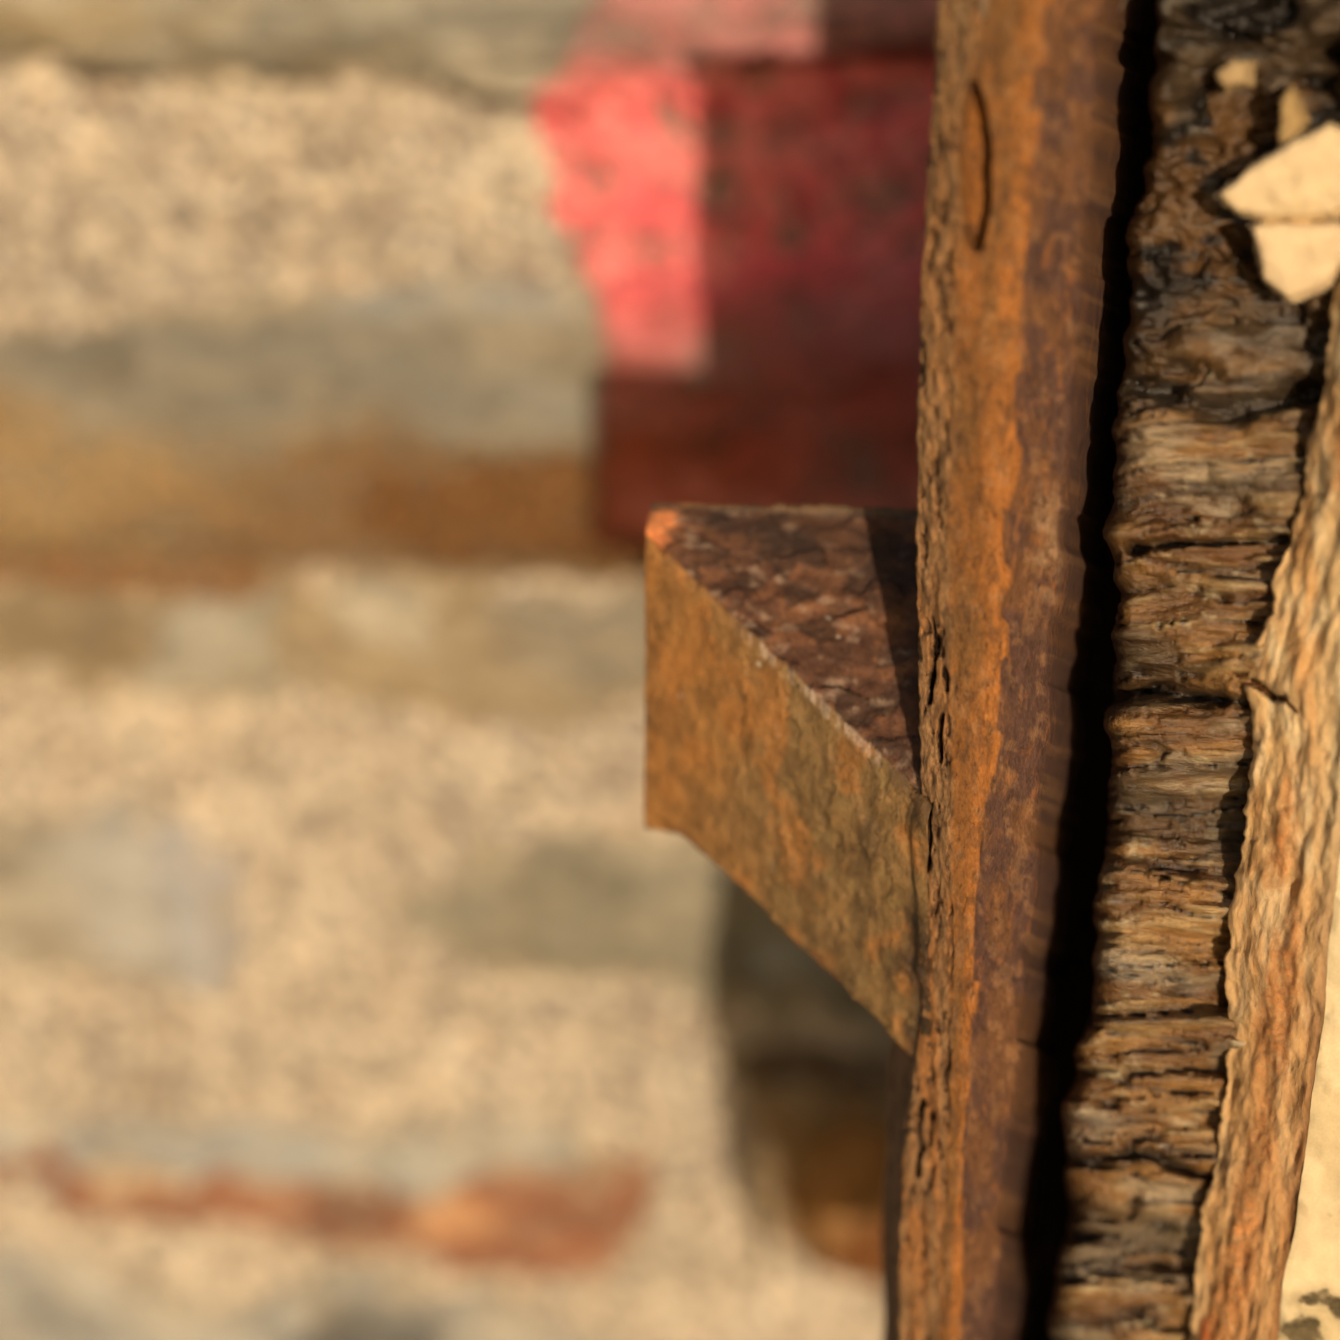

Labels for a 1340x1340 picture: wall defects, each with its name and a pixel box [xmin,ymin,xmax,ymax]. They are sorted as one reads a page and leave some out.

peeling [1213,53,1257,95]
peeling [1275,84,1311,150]
spalling [1189,220,1340,1340]